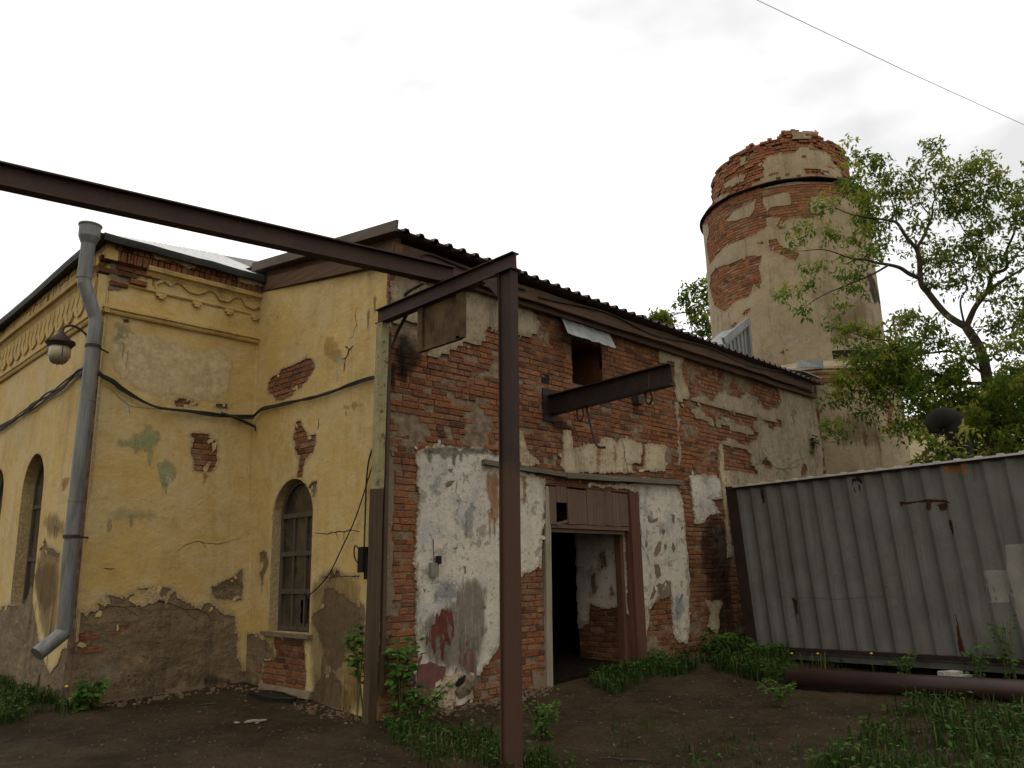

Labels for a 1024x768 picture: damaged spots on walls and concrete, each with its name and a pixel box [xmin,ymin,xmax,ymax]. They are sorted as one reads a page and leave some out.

spalling [703,130,848,328]
spalling [268,358,315,401]
damp [392,335,421,387]
damp [119,426,176,492]
spalling [191,433,217,472]
spalling [294,421,317,497]
peeling [519,430,546,578]
peeling [558,350,826,644]
rust [899,499,953,535]
peeling [412,440,500,713]
peeling [0,568,366,712]